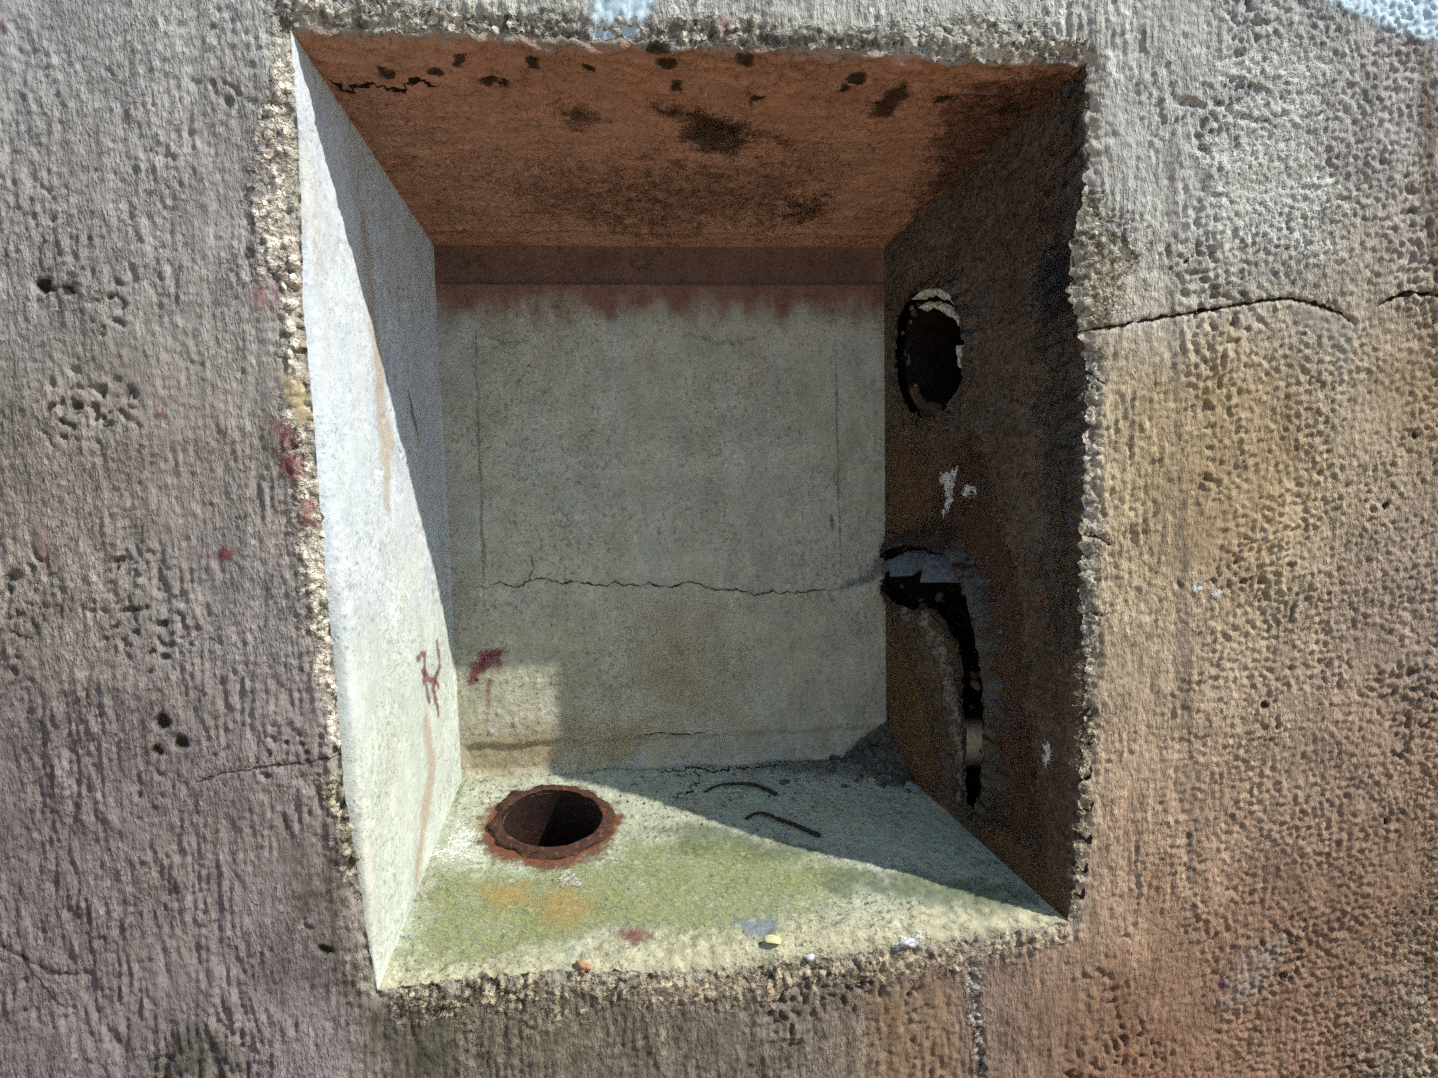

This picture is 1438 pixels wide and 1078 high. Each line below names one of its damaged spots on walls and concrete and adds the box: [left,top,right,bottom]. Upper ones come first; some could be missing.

spalling [241,0,1089,754]
crack [1074,290,1438,384]
crack [477,556,840,596]
spalling [389,184,1154,1078]
rust [885,435,1064,910]
spalling [313,774,363,900]
rust [475,786,624,871]